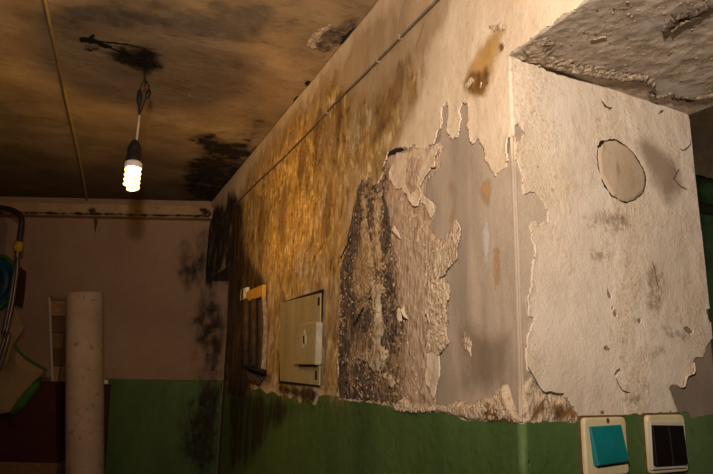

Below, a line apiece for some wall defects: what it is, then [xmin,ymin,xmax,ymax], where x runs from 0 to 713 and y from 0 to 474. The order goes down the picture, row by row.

spalling [306,20,356,52]
corrosion [465,22,507,95]
spalling [517,37,713,103]
leakage [184,0,446,397]
peeling [337,103,579,423]
peeling [670,341,713,418]